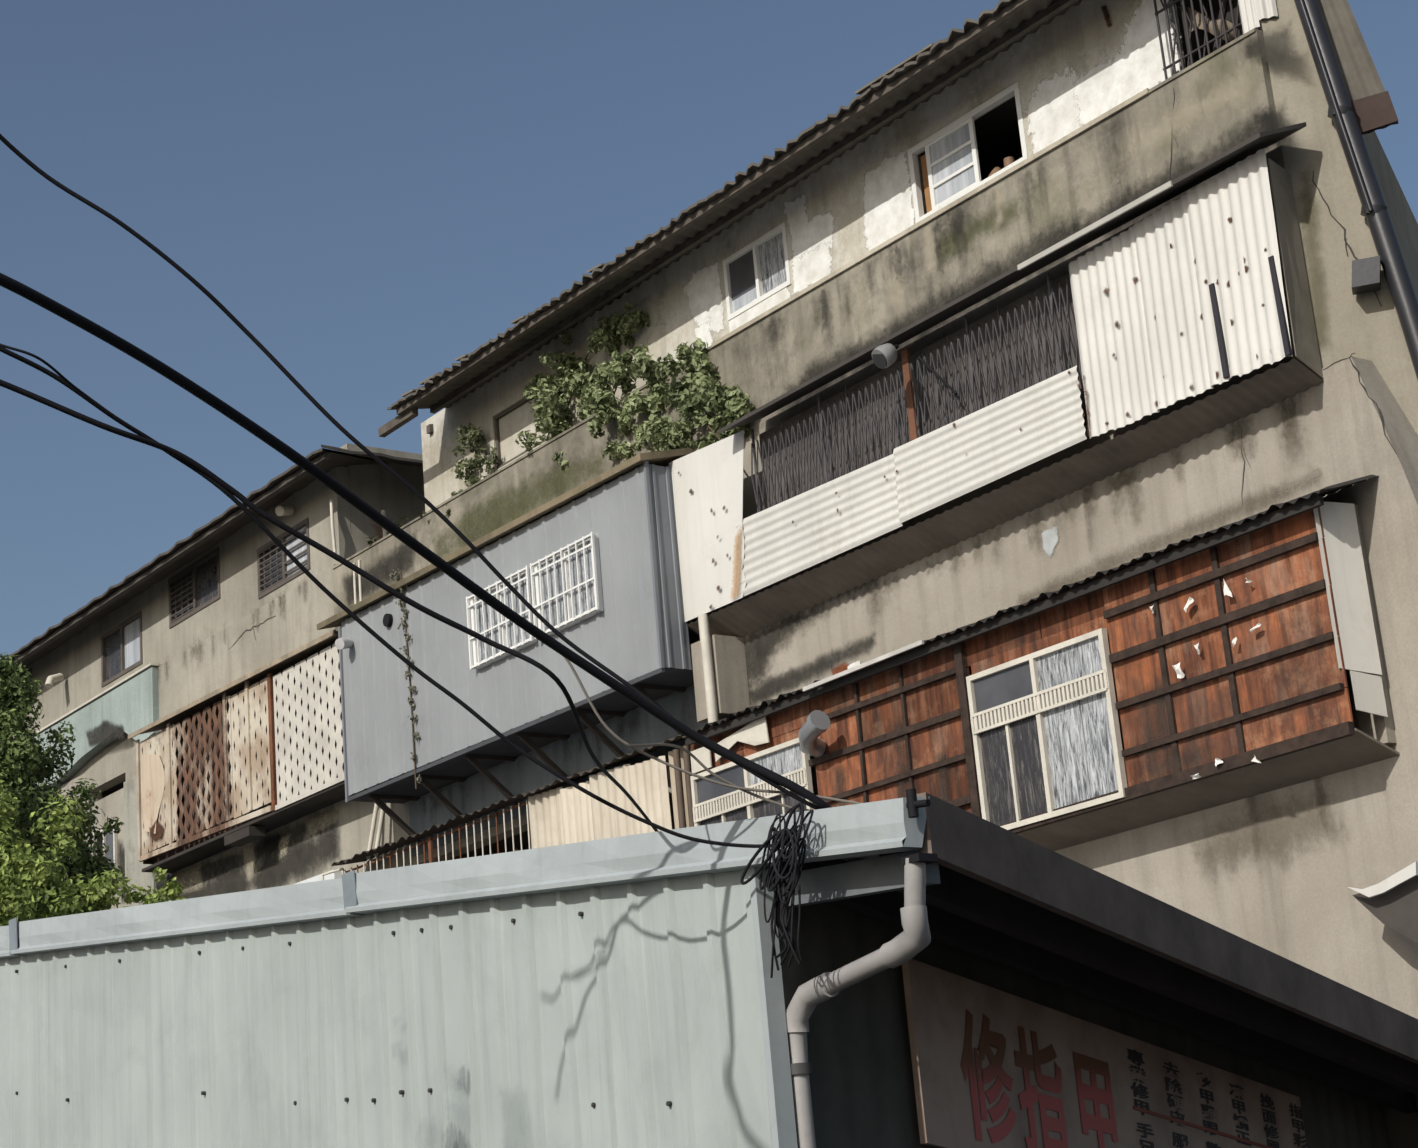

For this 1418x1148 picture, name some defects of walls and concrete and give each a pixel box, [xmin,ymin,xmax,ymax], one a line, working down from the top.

peeling [1024,0,1181,154]
damp [1246,28,1294,63]
peeling [683,194,835,348]
peeling [862,149,915,251]
damp [790,109,1286,401]
crack [1312,171,1358,260]
crack [1322,353,1397,454]
damp [1023,489,1289,604]
damp [117,842,125,901]
damp [156,810,338,902]